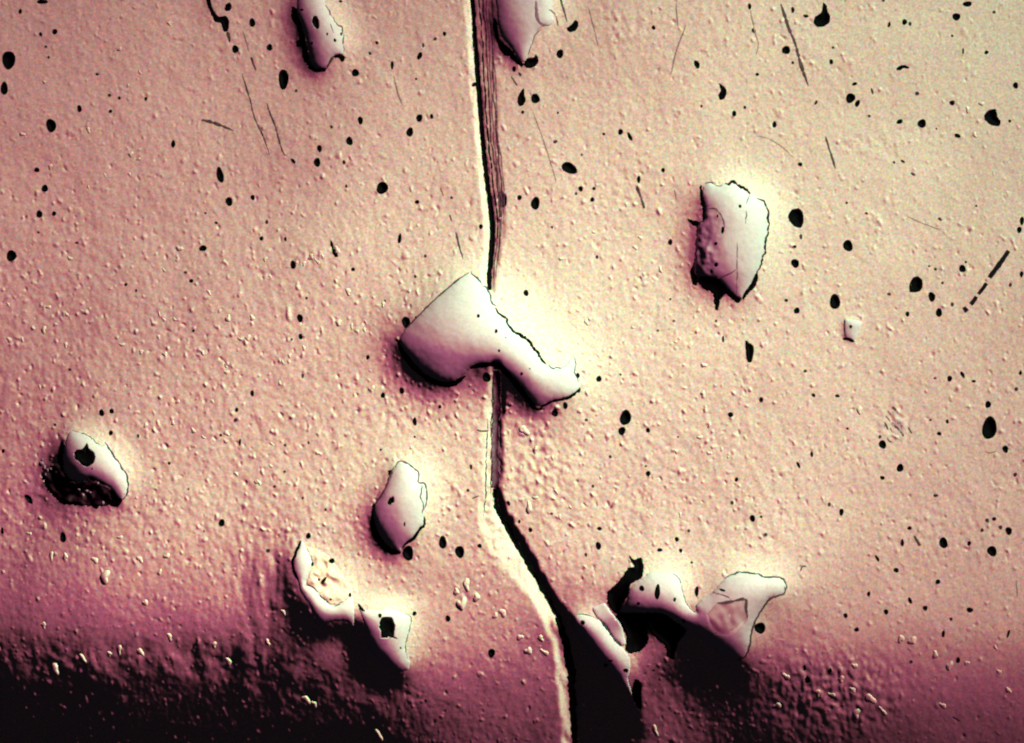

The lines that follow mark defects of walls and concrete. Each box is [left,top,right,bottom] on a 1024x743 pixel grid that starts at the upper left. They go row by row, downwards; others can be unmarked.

peeling [291,0,359,77]
peeling [493,0,578,114]
crack [470,0,507,290]
peeling [688,180,770,322]
peeling [38,430,129,509]
peeling [291,533,417,672]
peeling [370,460,428,561]
crack [477,370,578,743]
peeling [571,555,788,711]